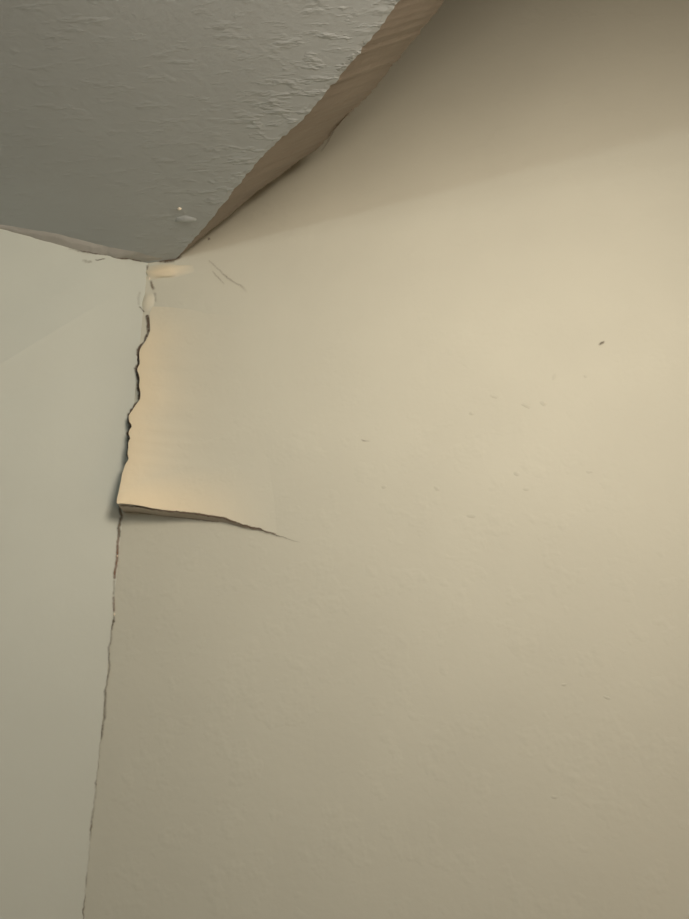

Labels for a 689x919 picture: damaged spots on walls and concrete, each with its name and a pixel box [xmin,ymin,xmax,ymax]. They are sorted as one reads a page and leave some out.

crack [125,307,150,464]
crack [111,507,122,629]